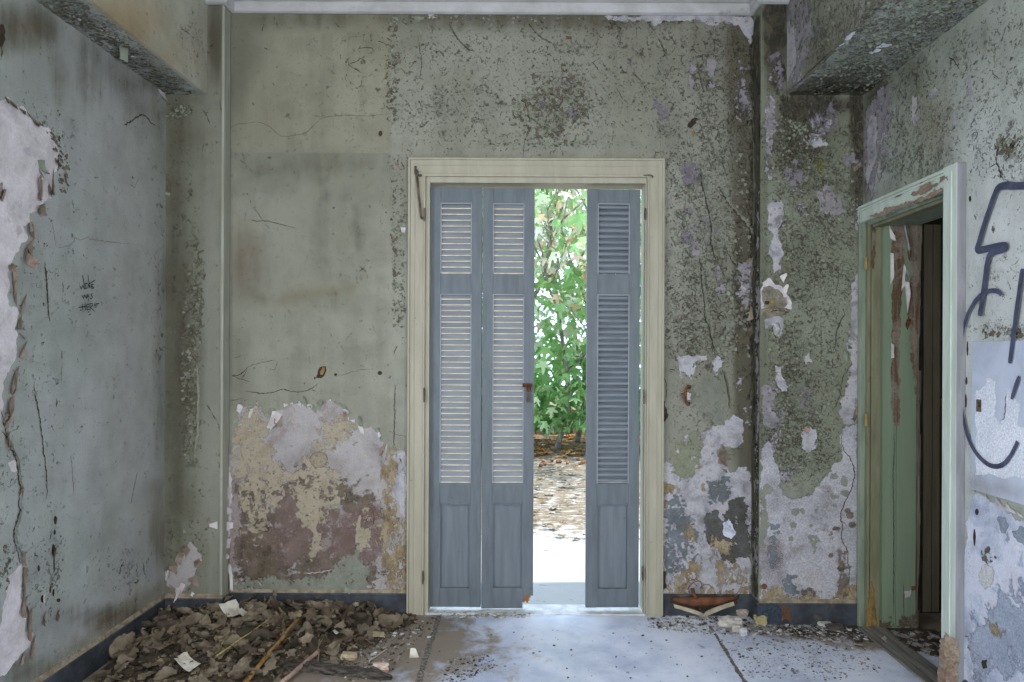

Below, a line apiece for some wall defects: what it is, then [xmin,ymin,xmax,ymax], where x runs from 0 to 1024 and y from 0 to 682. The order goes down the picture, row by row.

crack [203,100,384,146]
peeling [0,96,70,449]
peeling [663,0,1024,623]
peeling [0,545,60,677]
crack [1,354,62,562]
peeling [165,529,202,602]
peeling [207,396,407,594]
crack [832,269,856,600]
peeling [937,493,1024,682]